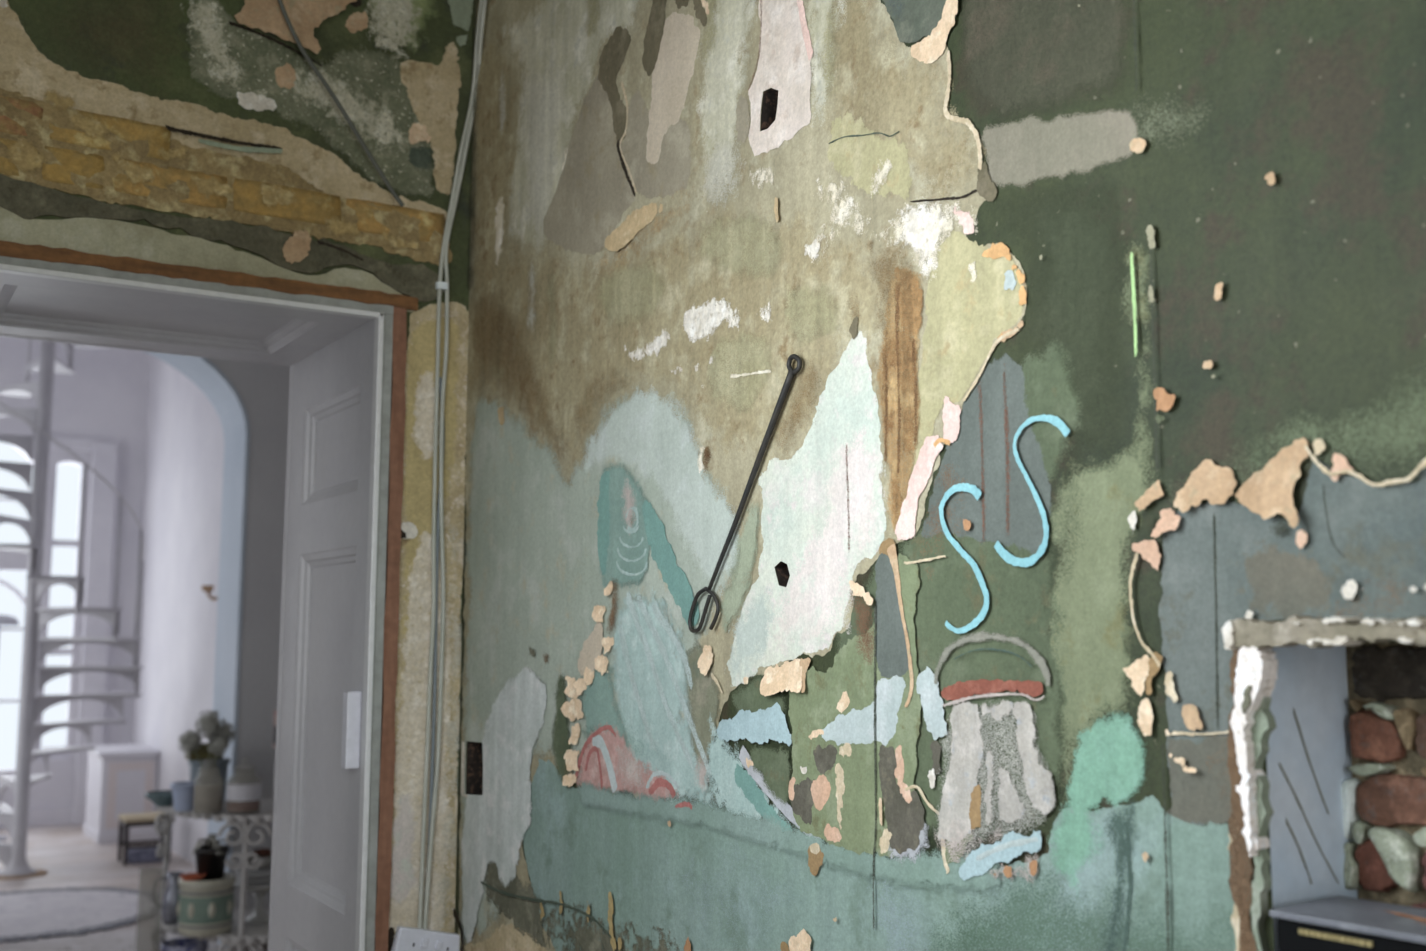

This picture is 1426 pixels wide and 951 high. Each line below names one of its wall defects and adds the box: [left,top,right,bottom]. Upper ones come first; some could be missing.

crack [165,125,283,154]
damp [180,0,435,197]
crack [616,139,635,197]
peeling [0,0,1027,951]
peeling [1341,579,1364,599]
flaking render [1222,610,1278,857]